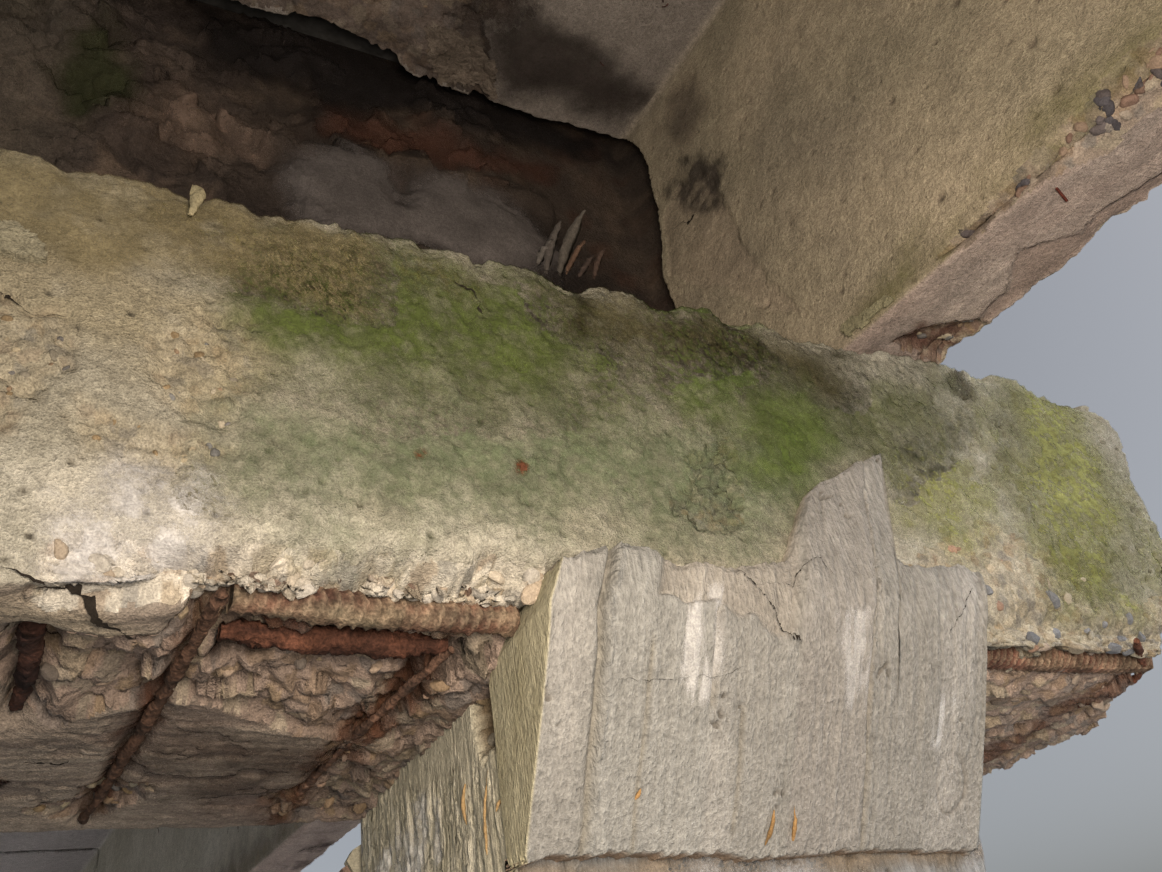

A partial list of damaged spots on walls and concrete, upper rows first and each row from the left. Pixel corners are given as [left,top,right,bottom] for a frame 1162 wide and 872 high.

spalling [239,0,516,100]
leakage [194,3,593,158]
leakage [472,2,651,114]
leakage [667,156,720,211]
spalling [0,284,80,442]
spalling [62,292,270,485]
crack [2,567,141,640]
rust [82,595,207,810]
spalling [0,531,549,825]
rust [260,614,313,630]
rust [273,654,430,824]
spalling [901,517,1162,776]